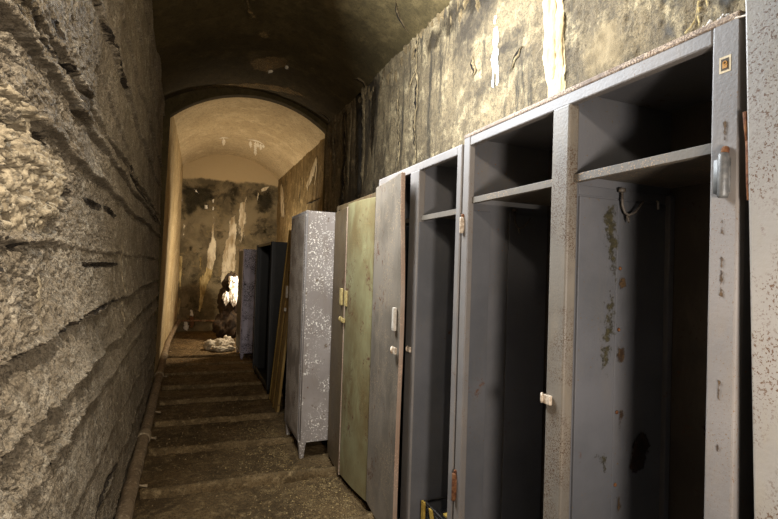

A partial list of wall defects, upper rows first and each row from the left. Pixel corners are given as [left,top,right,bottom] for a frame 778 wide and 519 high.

damp [491,16,499,88]
damp [542,0,565,97]
damp [183,187,212,214]
damp [198,185,284,312]